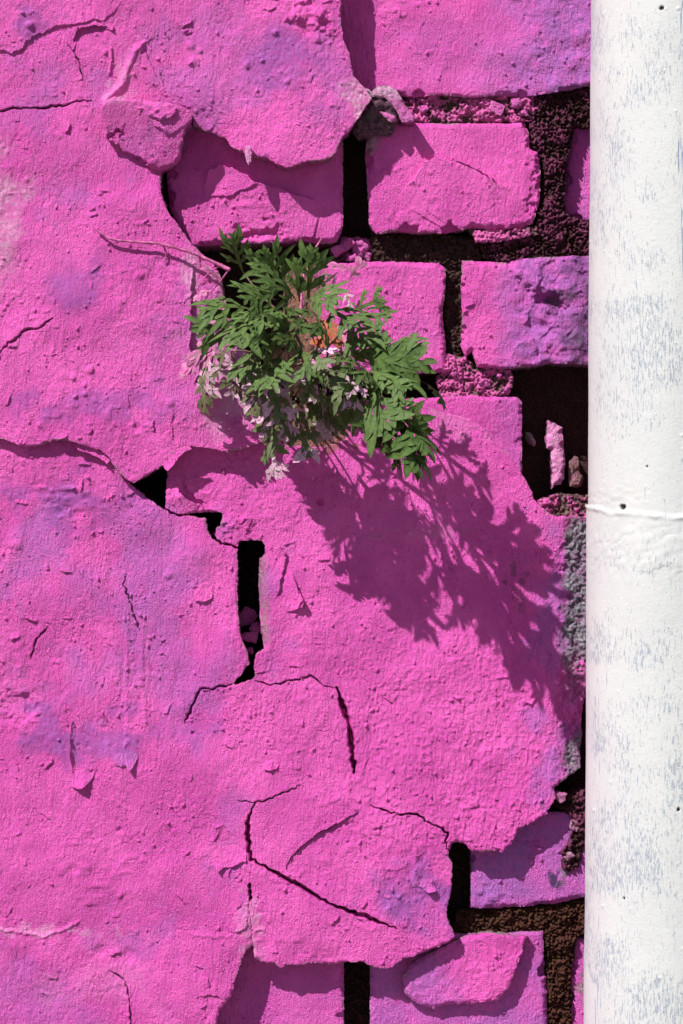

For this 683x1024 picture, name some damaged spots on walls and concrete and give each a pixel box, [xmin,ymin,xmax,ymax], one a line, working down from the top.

crack [2,47,89,112]
peeling [163,446,191,471]
crack [135,468,356,772]
crack [240,787,450,924]
peeling [410,873,436,893]